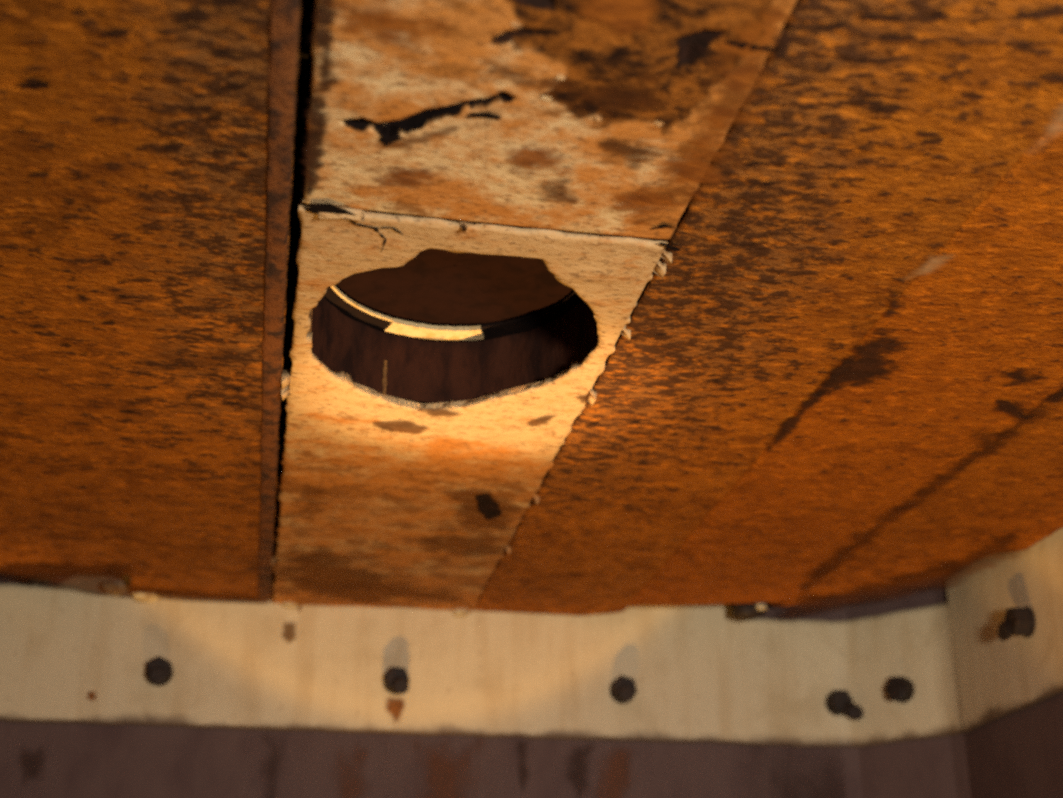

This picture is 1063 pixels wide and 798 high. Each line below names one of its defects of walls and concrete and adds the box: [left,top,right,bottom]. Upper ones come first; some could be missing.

peeling [492,0,773,133]
crack [343,91,515,147]
corrosion [665,7,789,199]
corrosion [376,170,432,187]
corrosion [510,149,576,204]
corrosion [374,421,426,434]
corrosion [424,408,458,417]
corrosion [529,416,553,427]
water stain [768,348,861,450]
water stain [798,391,1063,589]
corrosion [0,563,266,604]
corrosion [781,530,1018,618]